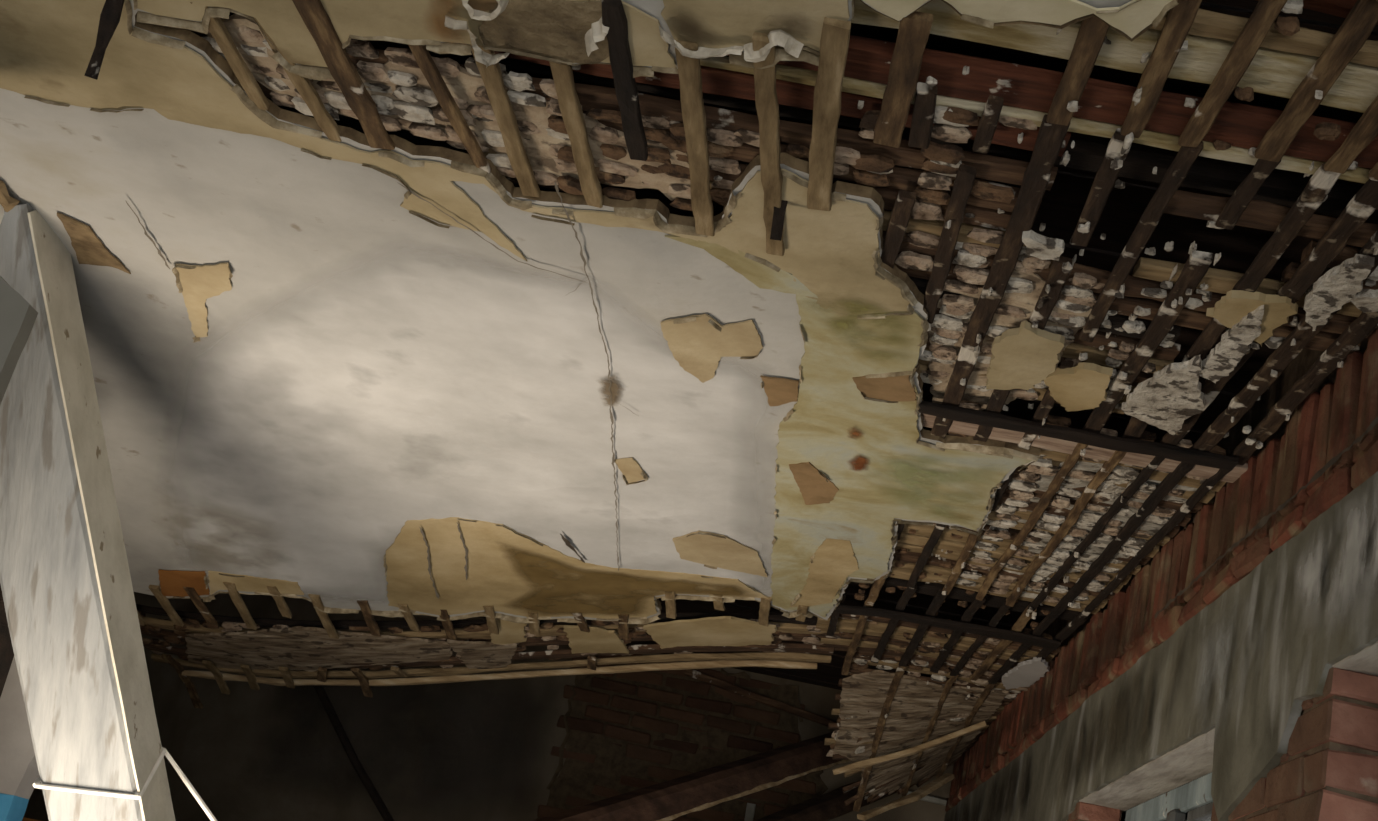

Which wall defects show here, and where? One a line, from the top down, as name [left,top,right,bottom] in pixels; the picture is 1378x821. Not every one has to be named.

spalling [0,0,927,317]
crack [397,182,633,571]
spalling [136,235,1031,821]
spalling [816,0,1378,689]
water stain [1299,511,1378,614]